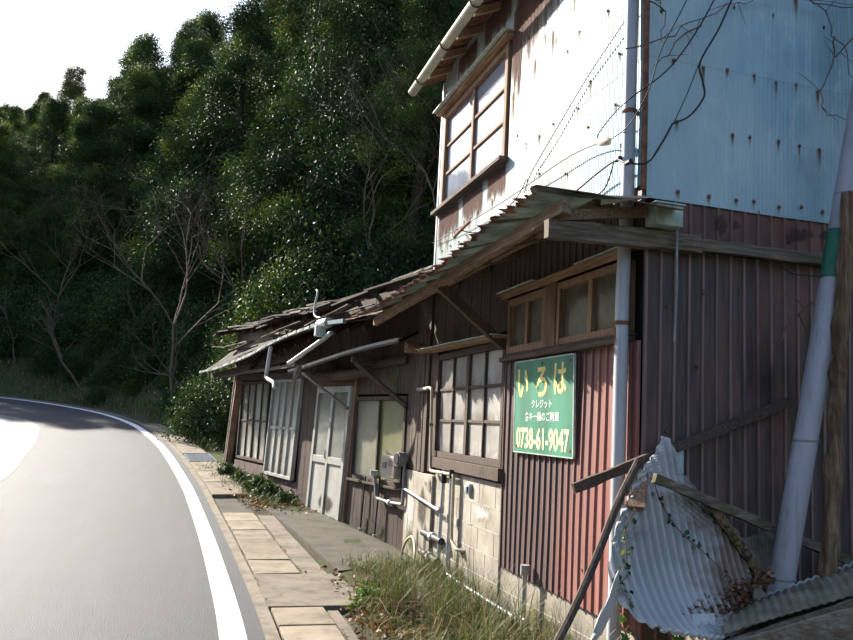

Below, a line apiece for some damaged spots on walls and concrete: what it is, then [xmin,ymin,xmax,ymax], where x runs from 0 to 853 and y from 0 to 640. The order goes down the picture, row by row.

rust [458,0,559,119]
rust [438,165,505,252]